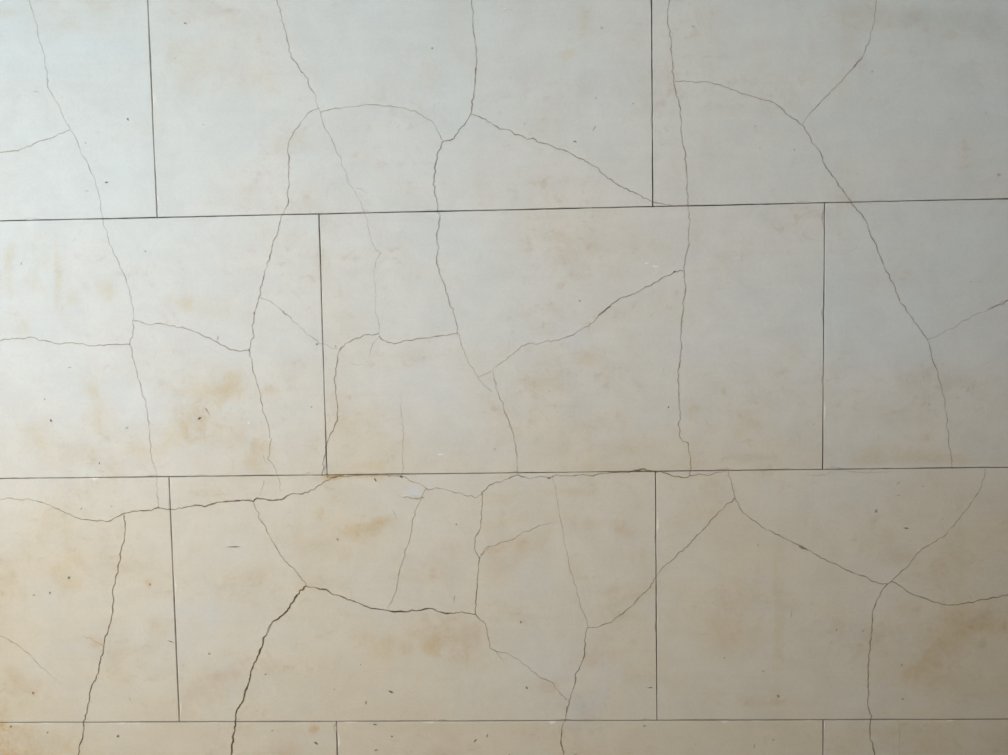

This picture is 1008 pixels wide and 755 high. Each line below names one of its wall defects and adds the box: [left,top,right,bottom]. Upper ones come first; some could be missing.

crack [78,451,359,755]
crack [231,585,478,755]